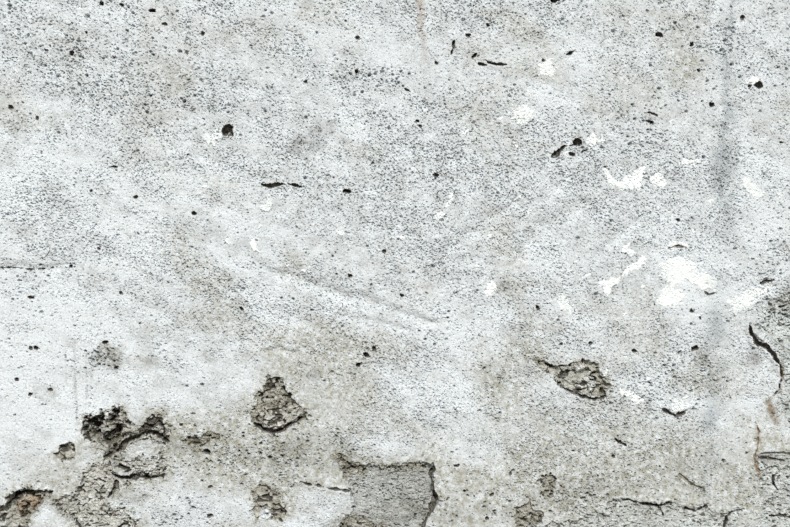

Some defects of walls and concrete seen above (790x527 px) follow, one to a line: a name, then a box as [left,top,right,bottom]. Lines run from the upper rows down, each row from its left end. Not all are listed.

spalling [250,374,309,435]
spalling [531,358,644,404]
crack [748,324,783,396]
spalling [0,405,221,527]
spalling [299,453,449,527]